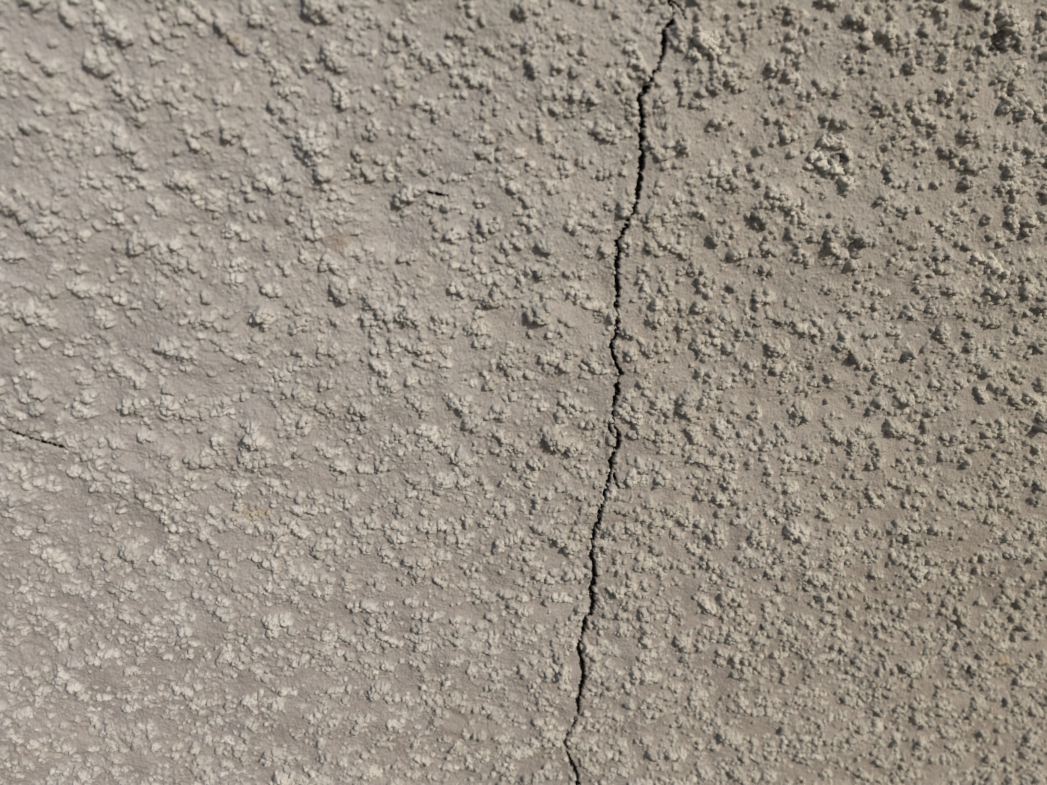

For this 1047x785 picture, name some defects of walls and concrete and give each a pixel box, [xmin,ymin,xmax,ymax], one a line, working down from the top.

crack [563,0,684,785]